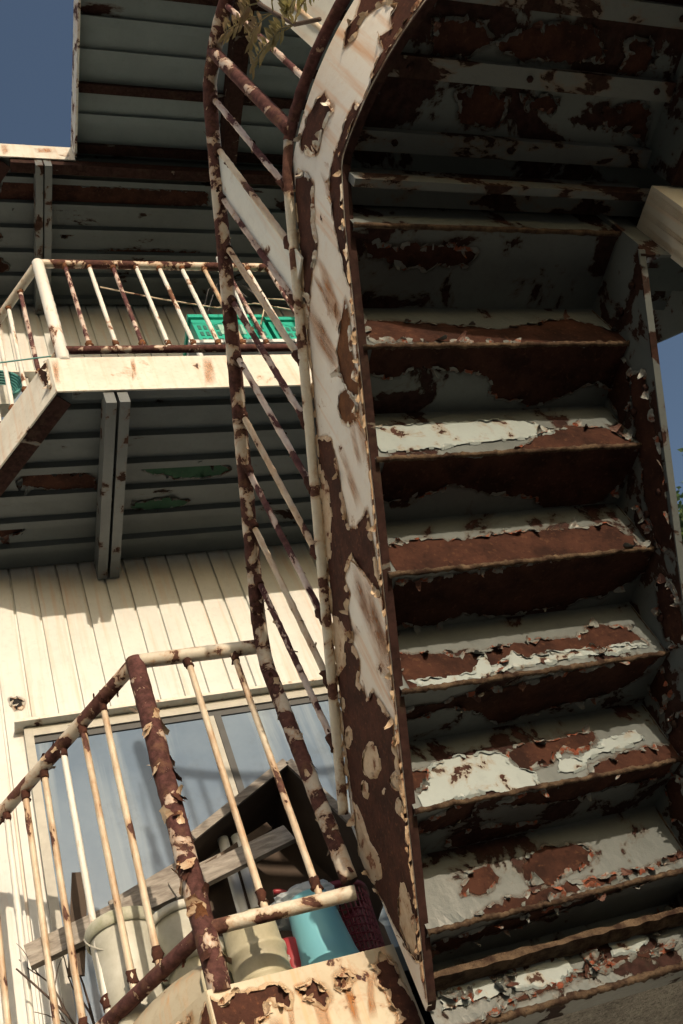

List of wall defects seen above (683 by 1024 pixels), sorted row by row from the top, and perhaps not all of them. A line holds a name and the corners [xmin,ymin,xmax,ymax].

peeling [288,0,683,1024]
peeling [142,707,170,738]
peeling [148,755,190,824]
peeling [171,857,210,920]
peeling [200,950,232,964]
peeling [176,970,357,1024]